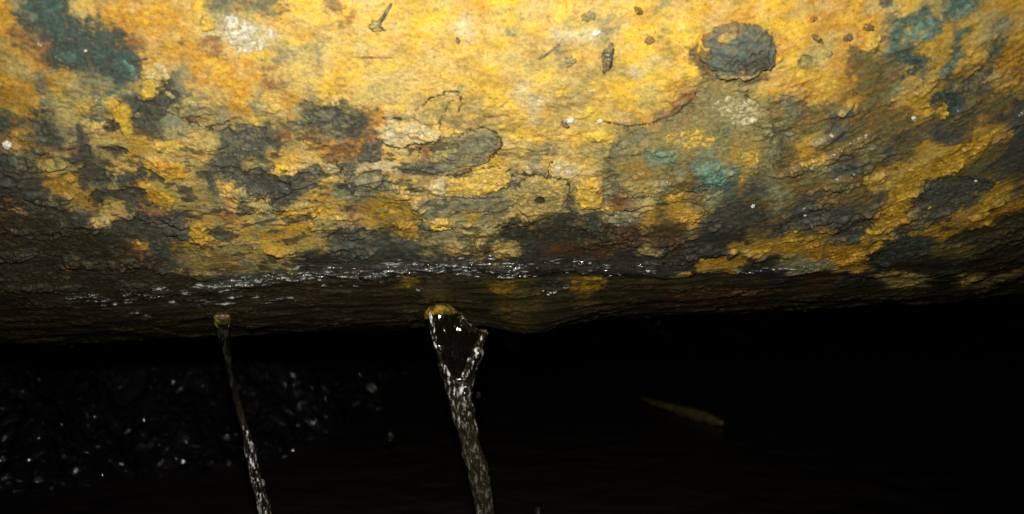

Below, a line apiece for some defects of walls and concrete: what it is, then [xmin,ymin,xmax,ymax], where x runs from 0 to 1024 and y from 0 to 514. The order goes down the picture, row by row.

corrosion [689,46,768,86]
corrosion [306,134,365,163]
corrosion [45,171,89,206]
corrosion [358,189,422,239]
corrosion [772,138,981,269]
corrosion [907,187,1024,243]
corrosion [131,239,149,251]
corrosion [562,221,682,257]
corrosion [709,257,746,268]
water stain [184,255,535,307]
corrosion [570,275,607,294]